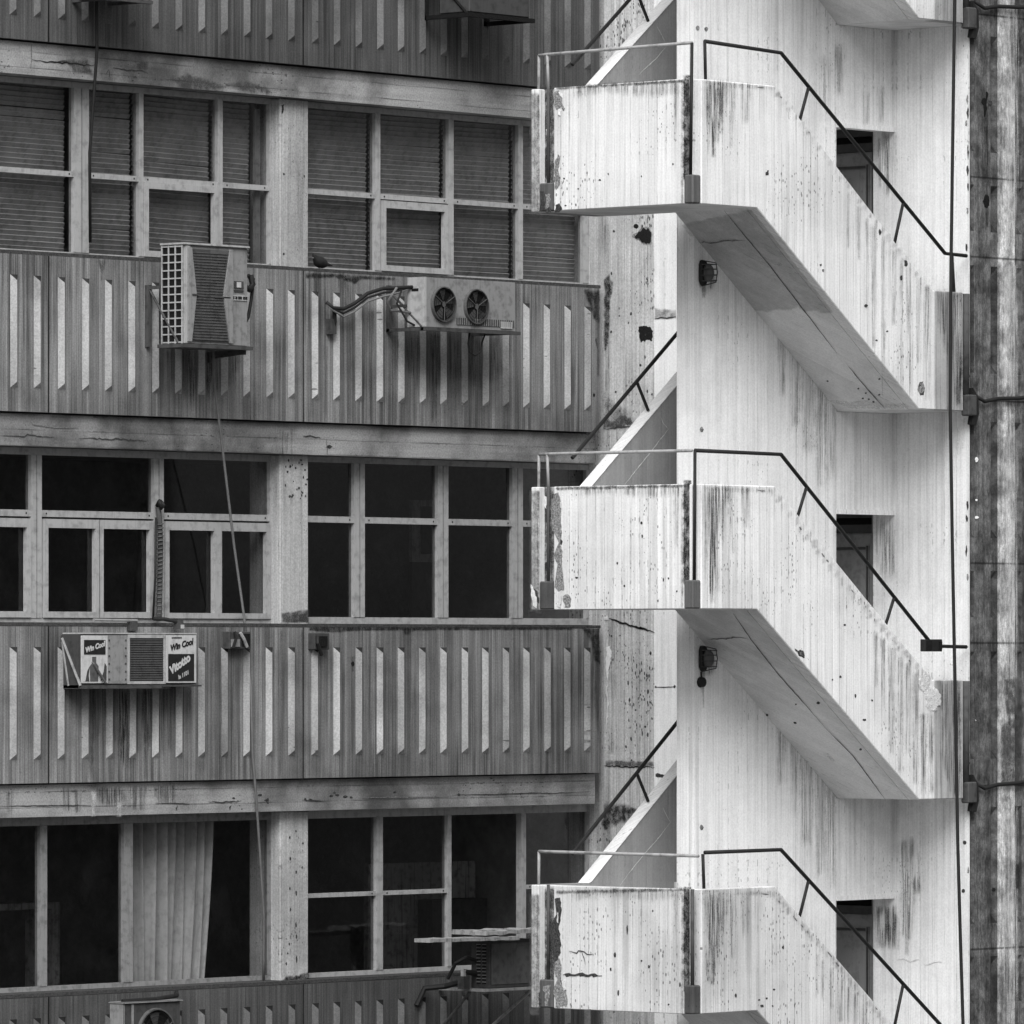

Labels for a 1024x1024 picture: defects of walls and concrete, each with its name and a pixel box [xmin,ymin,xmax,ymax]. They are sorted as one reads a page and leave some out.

peeling [545,90,565,134]
damp [707,82,722,155]
peeling [539,155,576,213]
spalling [632,224,653,245]
damp [585,276,613,373]
spalling [619,308,653,342]
peeling [544,492,578,608]
crack [604,616,655,633]
peeling [539,898,616,1008]